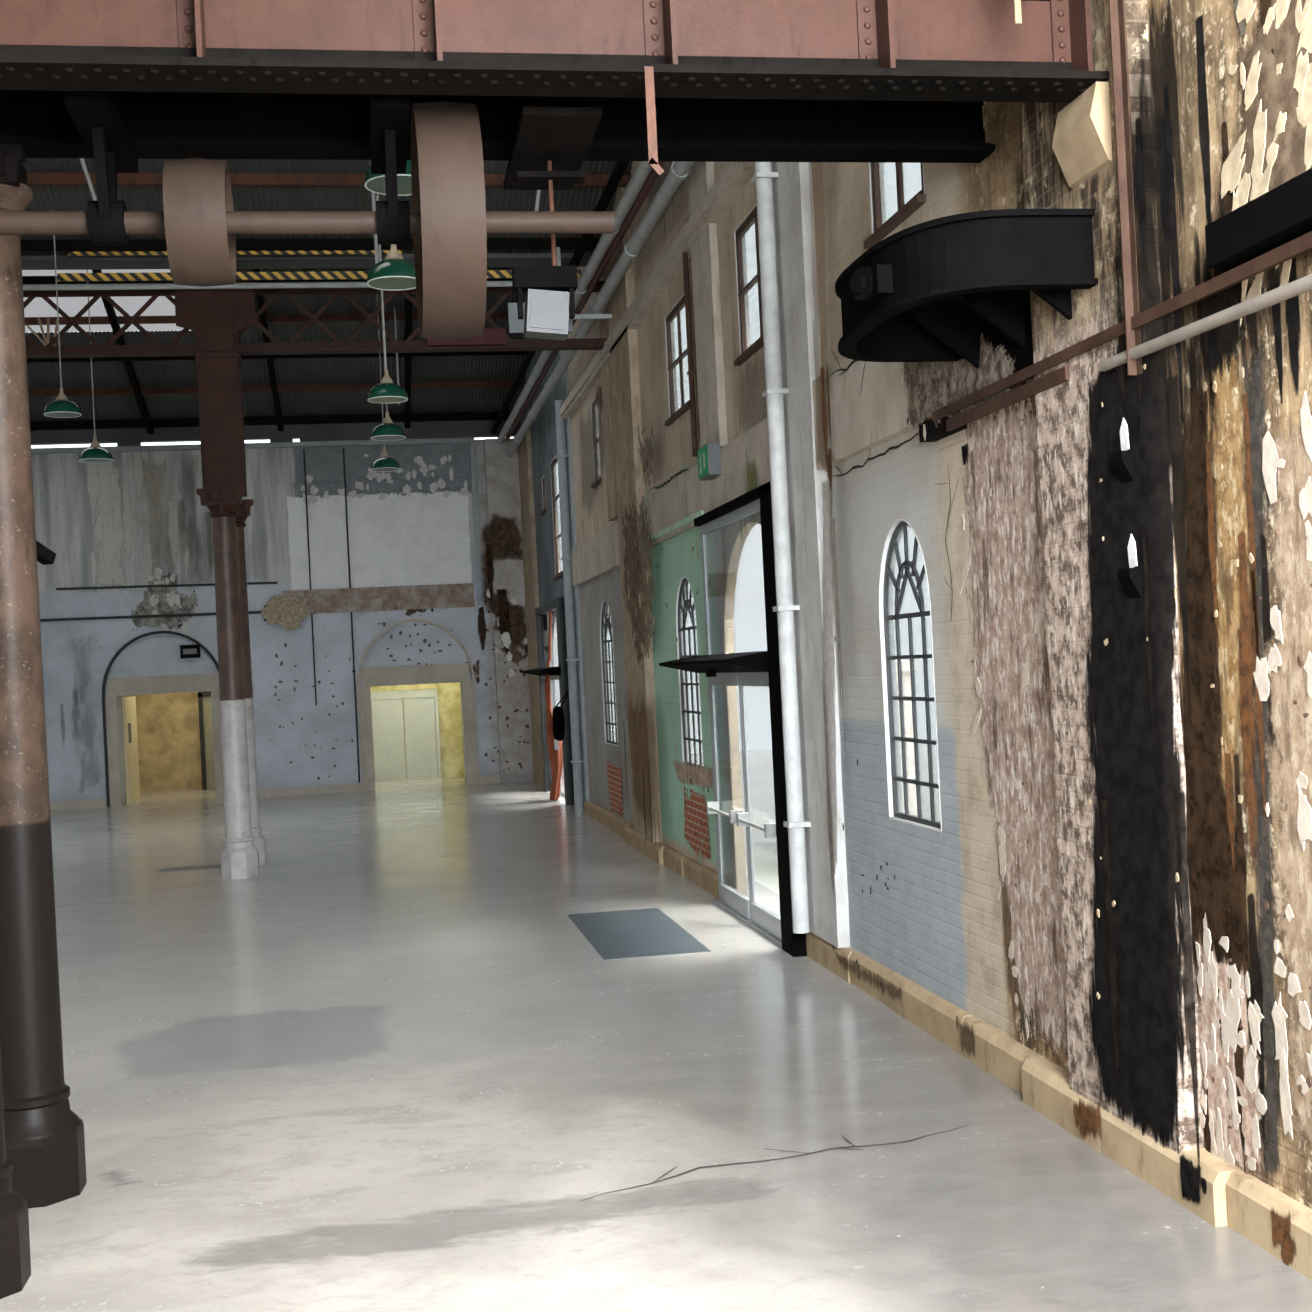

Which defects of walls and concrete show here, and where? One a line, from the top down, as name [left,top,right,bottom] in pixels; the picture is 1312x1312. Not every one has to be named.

peeling [1221,0,1312,215]
peeling [1232,253,1311,327]
peeling [293,454,471,505]
peeling [477,590,529,686]
peeling [1195,391,1312,1177]